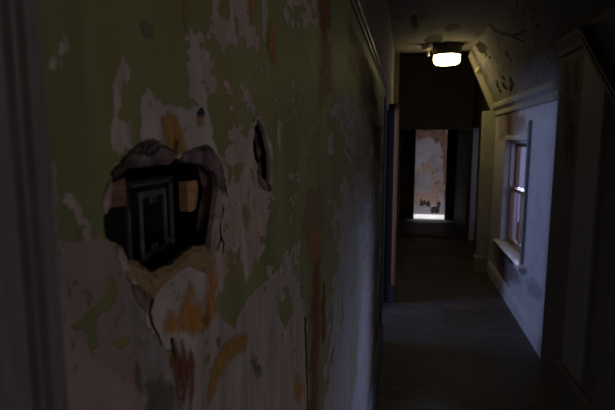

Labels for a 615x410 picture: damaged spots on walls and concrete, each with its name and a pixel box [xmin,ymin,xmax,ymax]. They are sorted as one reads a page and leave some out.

peeling [475,40,491,59]
peeling [48,0,309,410]
peeling [414,130,447,214]
crack [148,297,176,364]